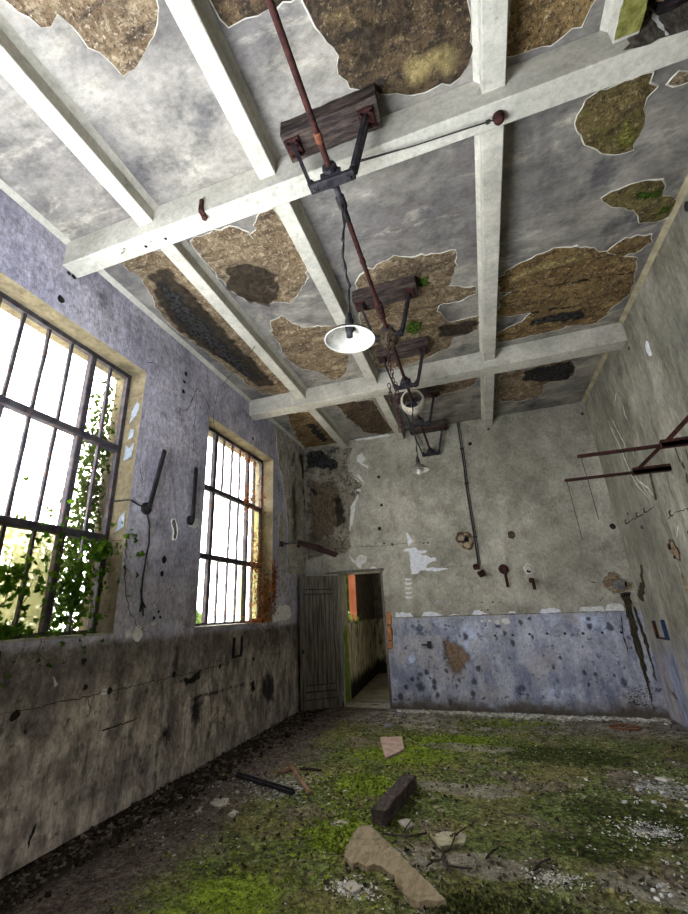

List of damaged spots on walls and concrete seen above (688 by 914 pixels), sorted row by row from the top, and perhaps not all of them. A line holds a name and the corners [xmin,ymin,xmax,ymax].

peeling [4,0,159,77]
peeling [209,0,473,96]
peeling [507,0,595,57]
peeling [574,70,688,156]
peeling [190,208,309,307]
peeling [496,178,676,342]
peeling [121,250,290,395]
peeling [270,315,349,381]
peeling [355,249,479,370]
peeling [495,359,576,402]
leakage [613,599,657,709]